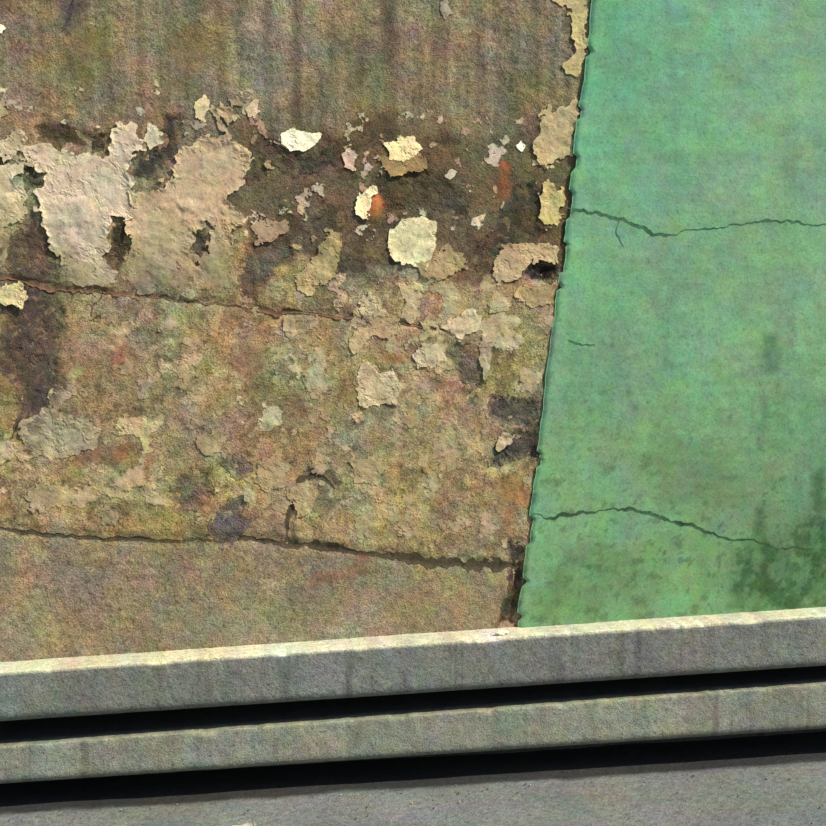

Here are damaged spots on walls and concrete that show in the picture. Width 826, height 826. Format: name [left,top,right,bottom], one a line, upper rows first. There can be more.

peeling [552,0,589,77]
crack [563,206,825,247]
water stain [10,281,44,319]
crack [0,273,368,320]
crack [296,473,334,487]
crack [1,504,517,572]
crack [533,506,813,550]